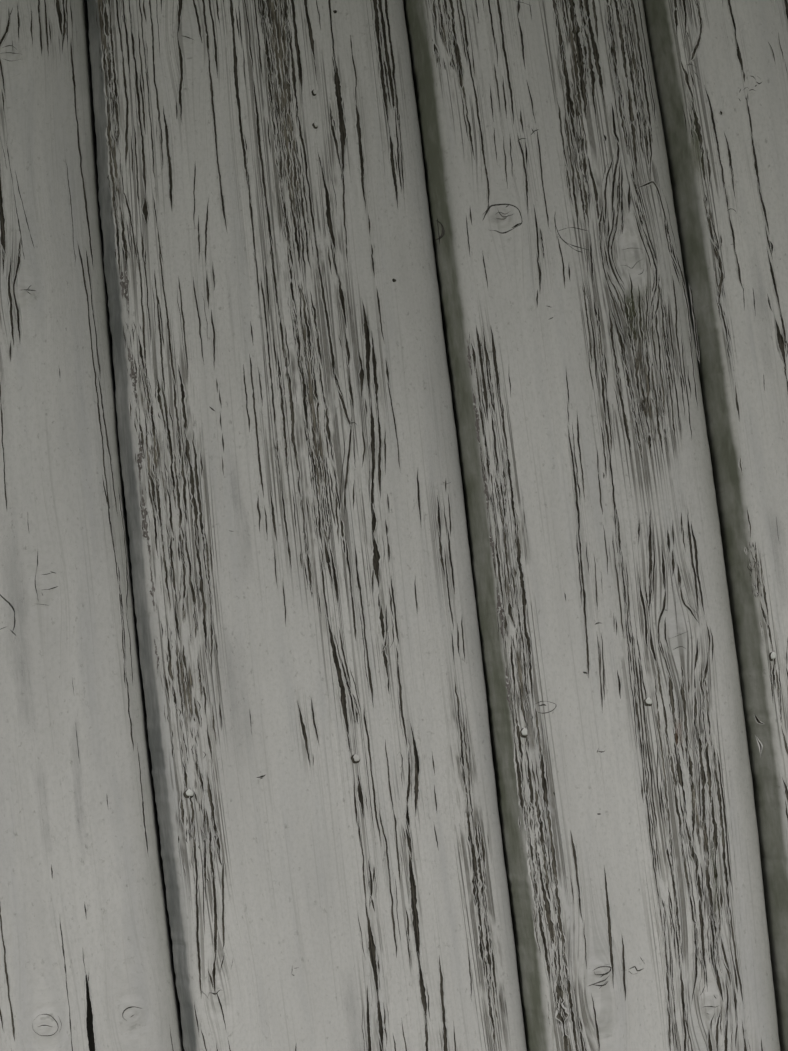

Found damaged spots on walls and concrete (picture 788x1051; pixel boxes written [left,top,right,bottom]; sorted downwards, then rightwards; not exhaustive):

crack [0,0,149,857]
peeling [96,0,223,883]
peeling [256,0,346,554]
peeling [583,271,676,462]
peeling [671,0,731,366]
crack [0,899,97,1051]
peeling [454,679,503,1047]
peeling [472,388,587,1051]
peeling [654,659,732,986]
peeling [744,509,788,757]